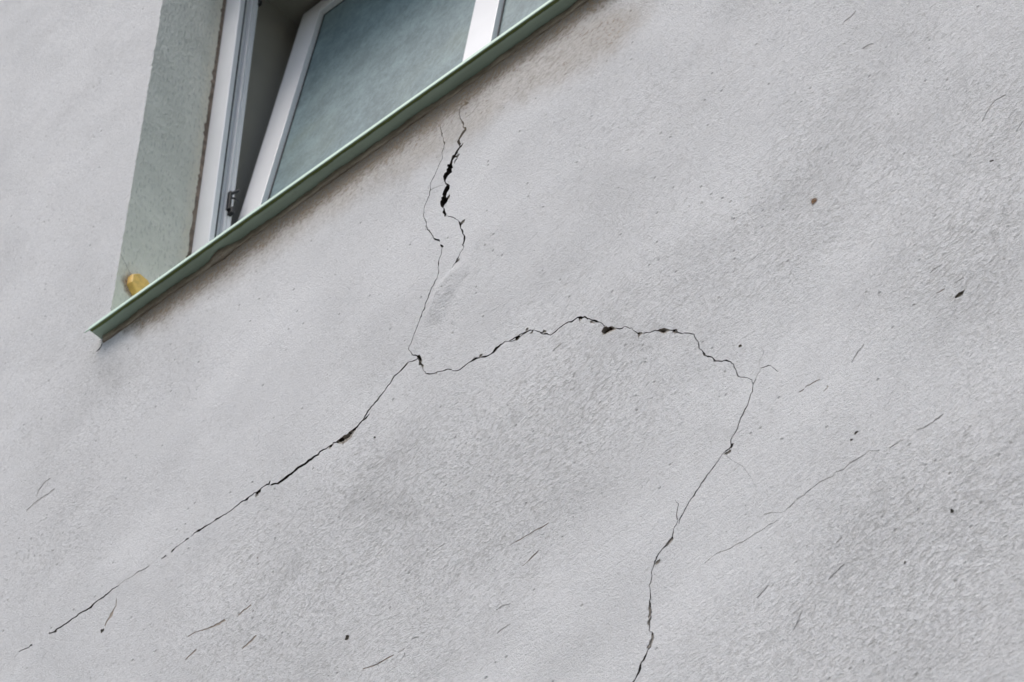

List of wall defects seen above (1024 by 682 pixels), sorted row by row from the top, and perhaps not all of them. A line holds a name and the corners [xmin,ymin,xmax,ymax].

crack [19,98,777,682]